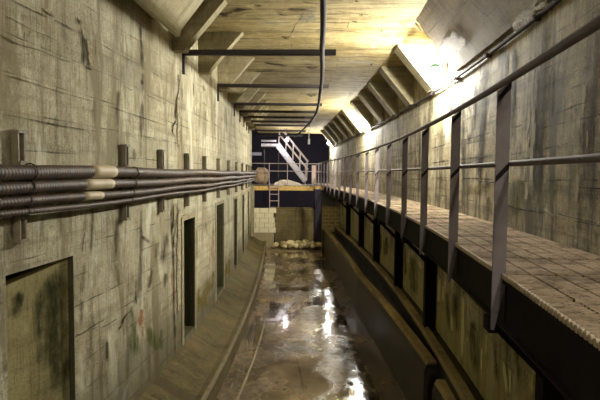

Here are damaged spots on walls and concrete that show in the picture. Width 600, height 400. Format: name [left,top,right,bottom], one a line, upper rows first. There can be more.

crack [14,1,96,70]
crack [112,26,183,146]
leakage [14,293,24,313]
leakage [437,279,453,332]
leakage [460,295,519,395]